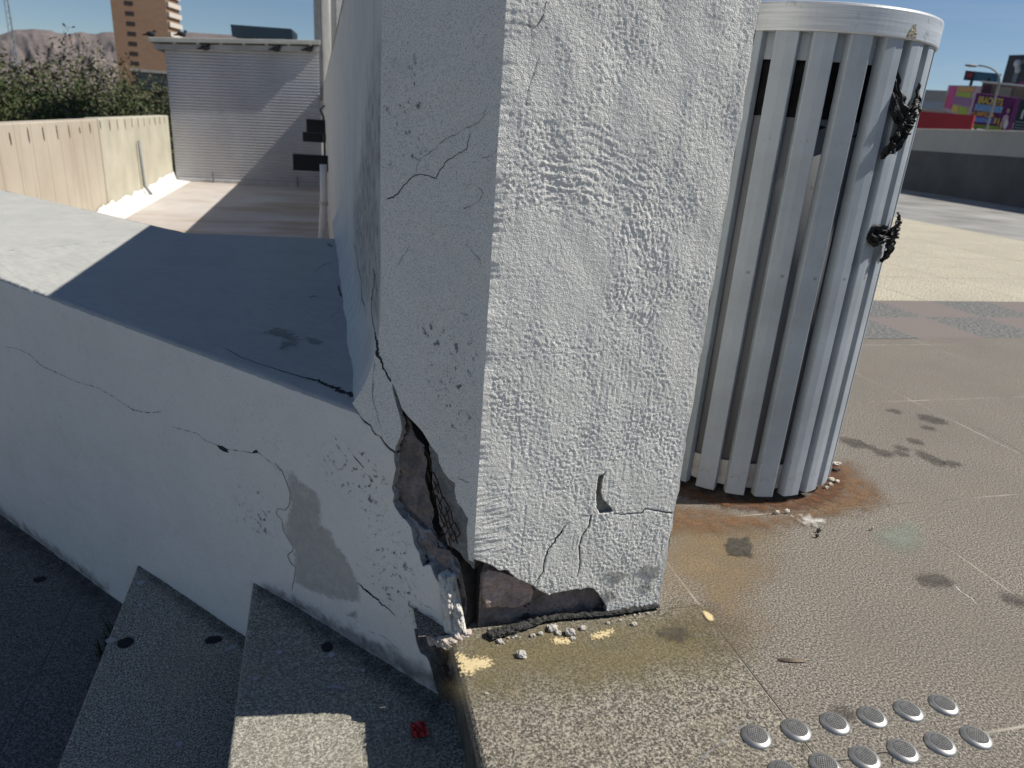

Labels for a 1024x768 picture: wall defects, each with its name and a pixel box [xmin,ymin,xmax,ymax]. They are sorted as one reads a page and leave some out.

crack [387,106,496,200]
crack [225,243,392,430]
crack [8,347,296,587]
spalling [395,411,630,631]
crack [534,509,672,584]
corrosion [673,461,879,531]